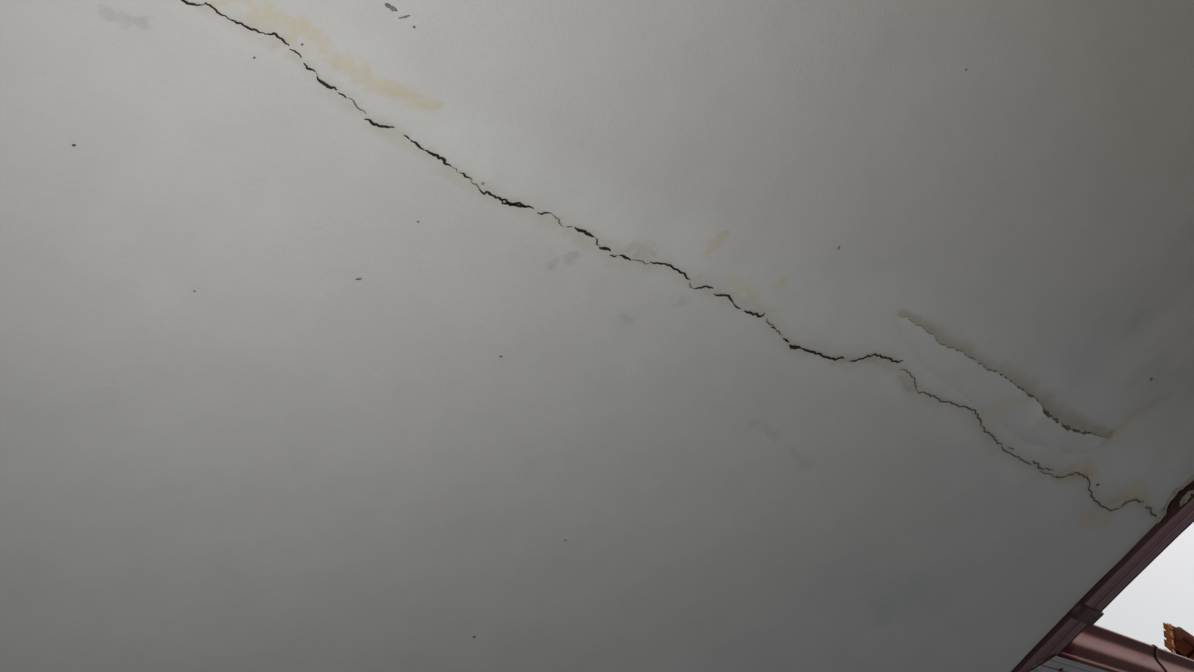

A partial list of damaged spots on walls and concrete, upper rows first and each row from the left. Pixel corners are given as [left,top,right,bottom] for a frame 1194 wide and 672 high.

crack [181,0,1165,518]